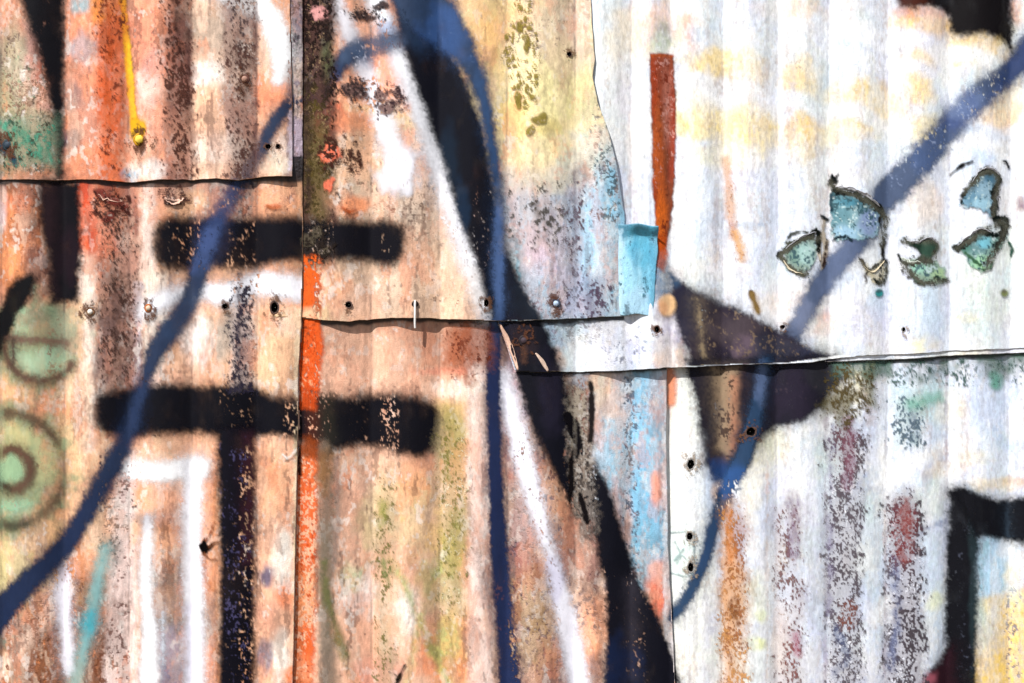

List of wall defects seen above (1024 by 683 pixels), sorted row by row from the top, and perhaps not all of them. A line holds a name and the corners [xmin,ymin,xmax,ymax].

rust [92,0,128,105]
rust [100,126,157,178]
rust [156,0,198,179]
rust [218,0,282,179]
rust [303,0,355,221]
peeling [776,174,949,297]
peeling [950,160,1014,273]
rust [78,210,157,388]
rust [221,274,284,395]
rust [442,330,492,365]